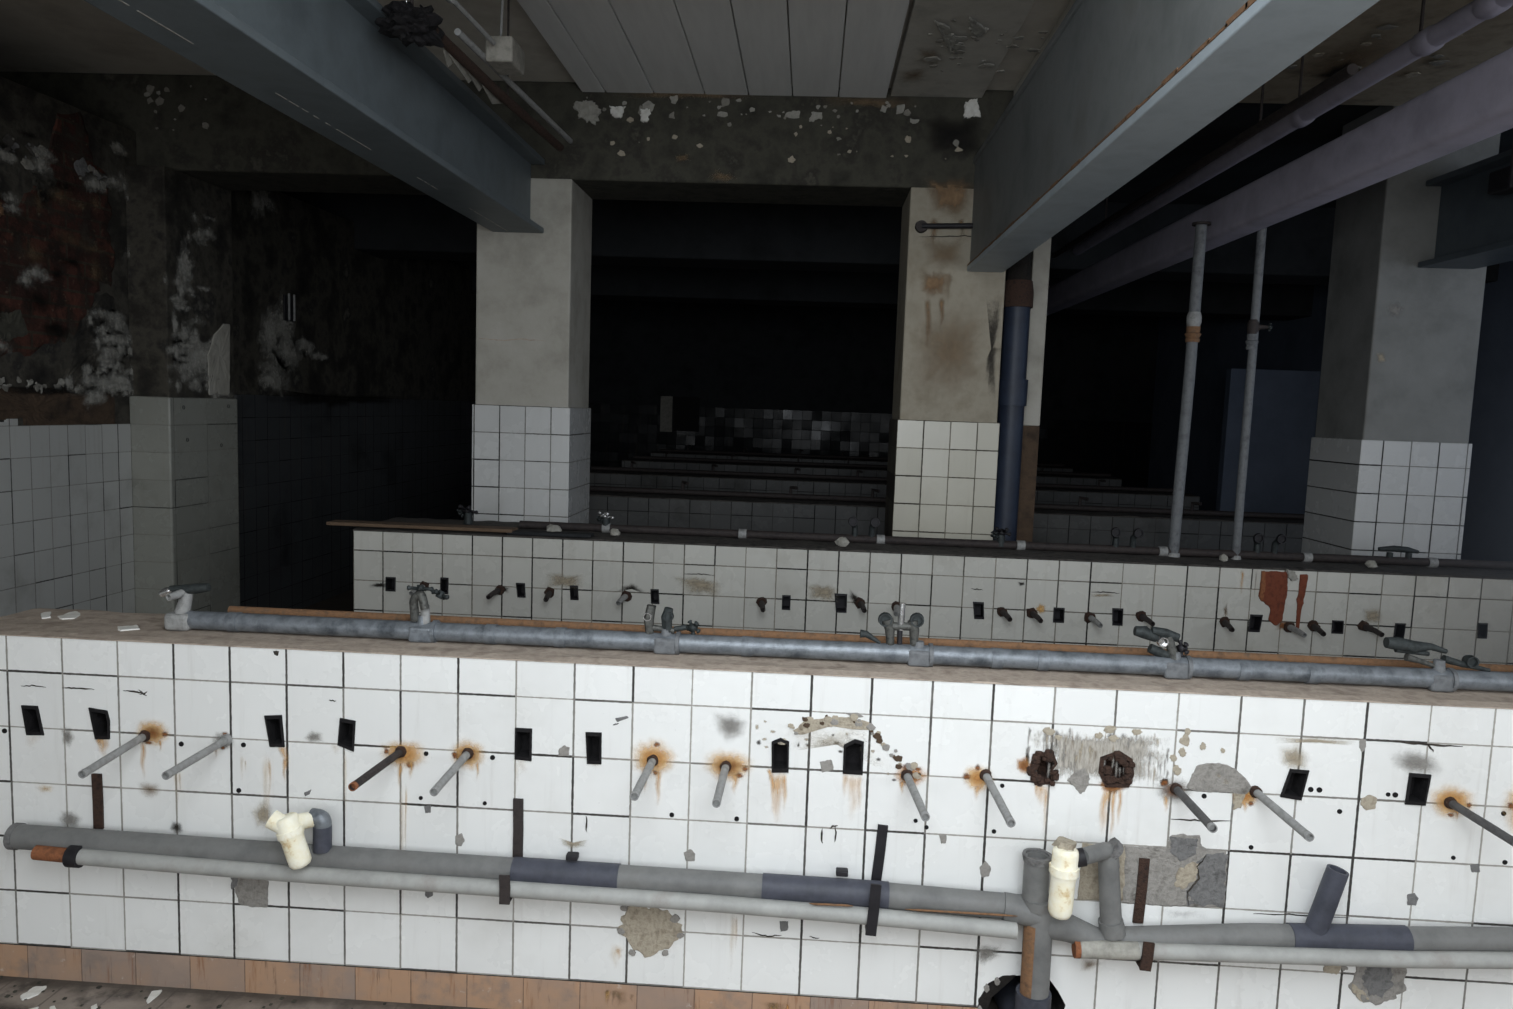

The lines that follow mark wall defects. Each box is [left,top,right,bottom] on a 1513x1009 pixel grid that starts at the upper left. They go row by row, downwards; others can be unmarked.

flaking render [0,111,115,357]
water stain [925,276,945,329]
water stain [988,312,998,379]
corrosion [1242,569,1308,628]
corrosion [385,745,419,775]
corrosion [713,756,748,783]
peeling [756,713,921,781]
corrosion [1019,749,1059,788]
corrosion [1100,751,1136,808]
peeling [1026,725,1251,810]
spalling [1119,834,1228,908]
spalling [1323,966,1407,1006]